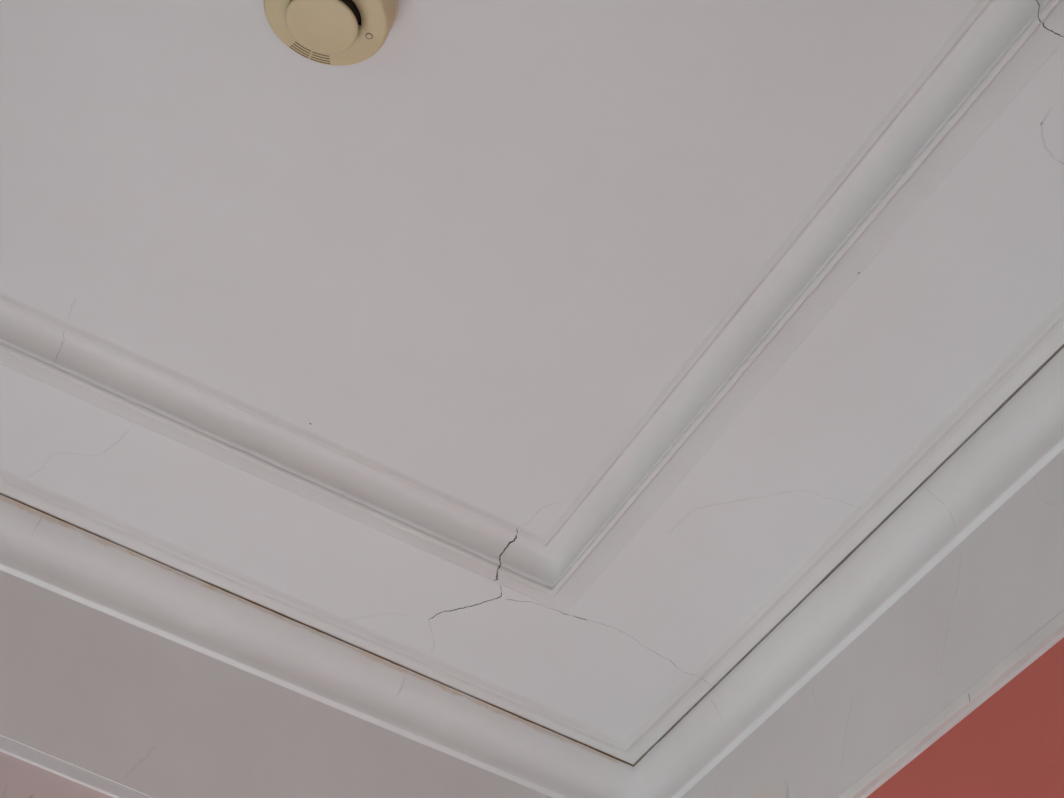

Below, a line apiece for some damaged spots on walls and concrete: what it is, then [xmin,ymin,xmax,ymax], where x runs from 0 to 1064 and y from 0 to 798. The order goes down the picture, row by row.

crack [0,345,1064,767]